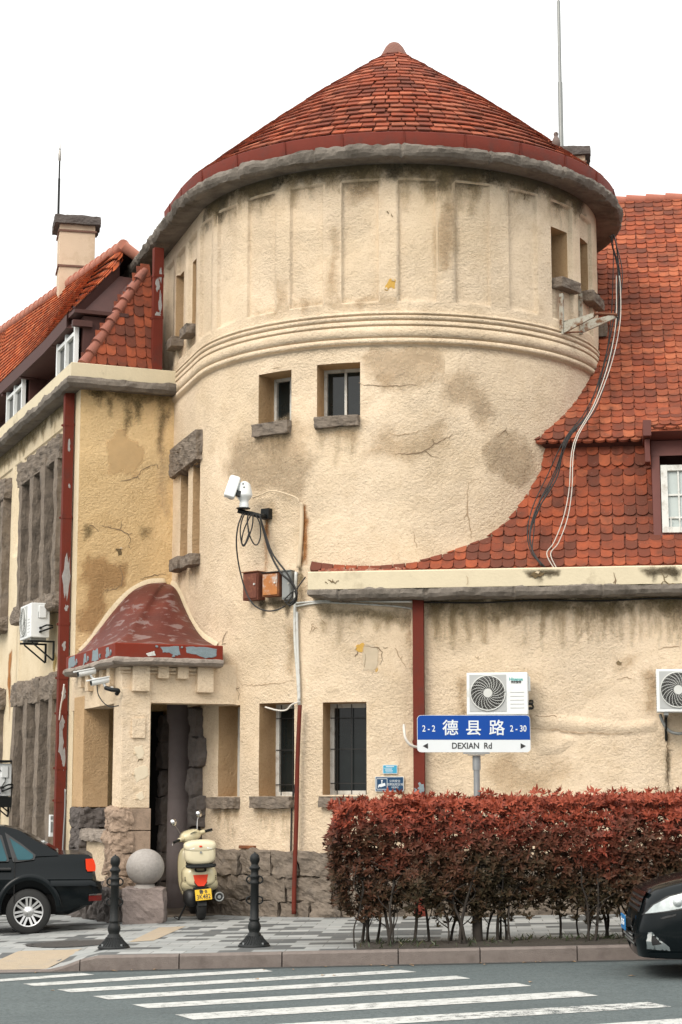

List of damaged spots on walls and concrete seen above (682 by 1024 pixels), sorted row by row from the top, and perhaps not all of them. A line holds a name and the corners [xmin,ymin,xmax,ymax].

water stain [204,164,584,221]
water stain [91,390,168,443]
crack [390,430,453,457]
peeling [62,554,71,611]
crack [89,523,165,593]
water stain [644,567,679,575]
water stain [429,598,620,621]
water stain [635,596,682,613]
peeling [146,645,217,659]